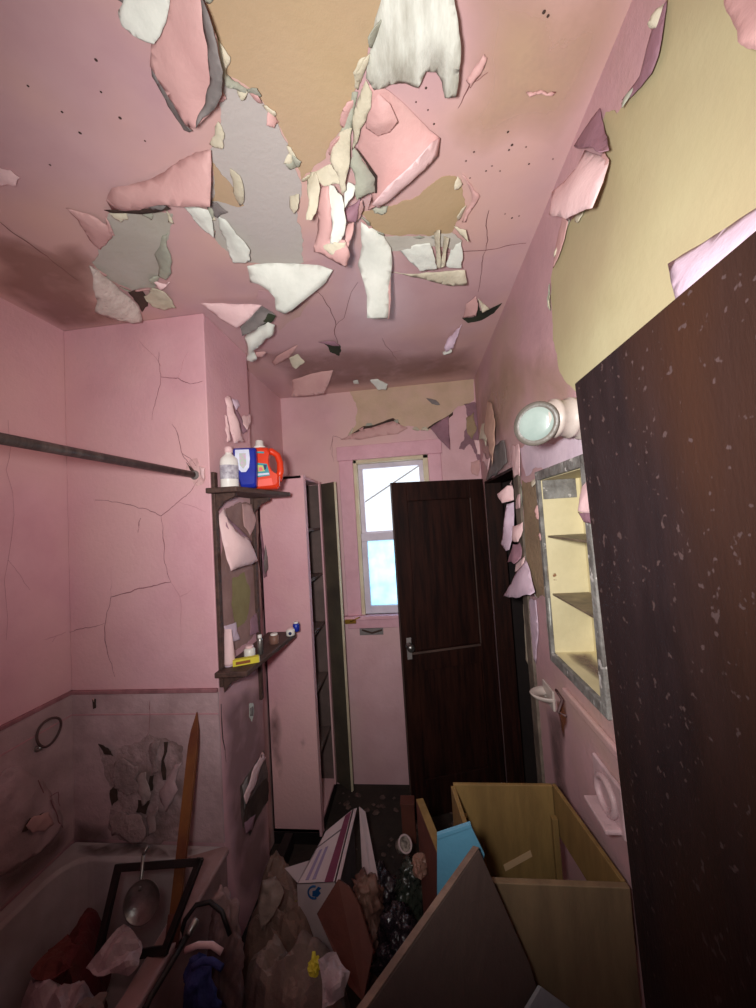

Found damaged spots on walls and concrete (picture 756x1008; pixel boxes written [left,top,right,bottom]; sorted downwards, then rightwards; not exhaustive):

peeling [66,0,480,397]
peeling [547,0,756,391]
peeling [442,296,489,355]
peeling [224,396,251,443]
crack [45,340,205,677]
peeling [219,502,268,650]
peeling [341,379,583,664]
flaking render [98,734,185,845]
spalling [240,751,269,835]